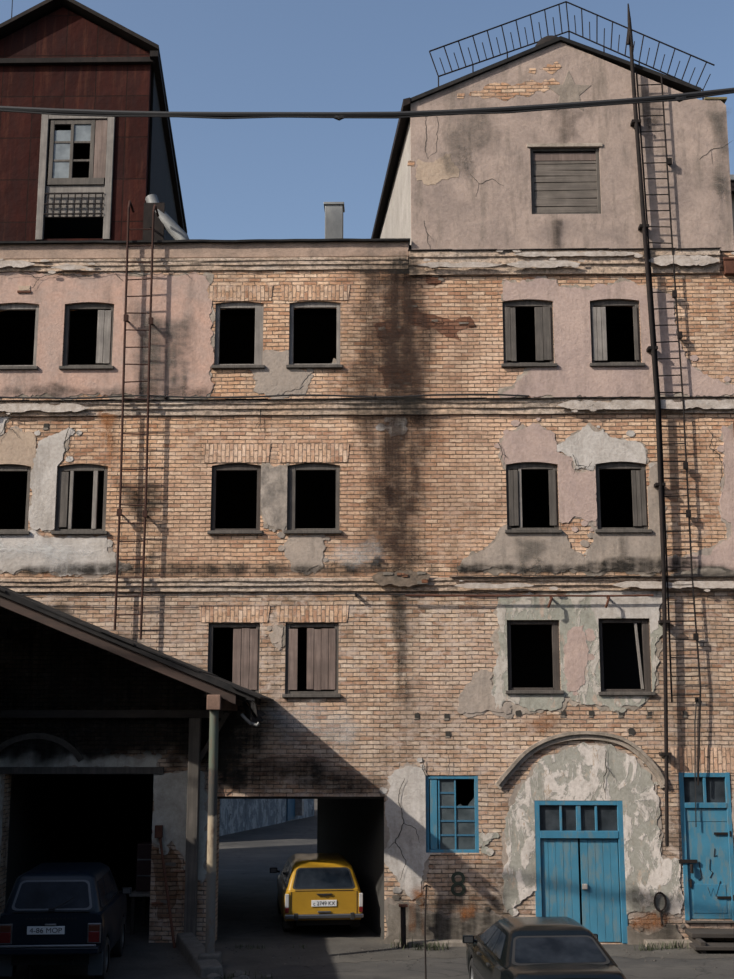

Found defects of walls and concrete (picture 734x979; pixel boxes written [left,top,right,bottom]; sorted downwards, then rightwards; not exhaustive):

peeling [0,259,215,578]
damp [139,320,187,395]
damp [163,258,432,576]
peeling [418,250,734,412]
damp [0,544,151,574]
damp [458,564,486,572]
peeling [444,418,734,720]
damp [498,542,724,573]
peeling [0,752,188,870]
peeling [198,771,208,884]
crack [390,755,450,877]
peeling [379,742,685,945]